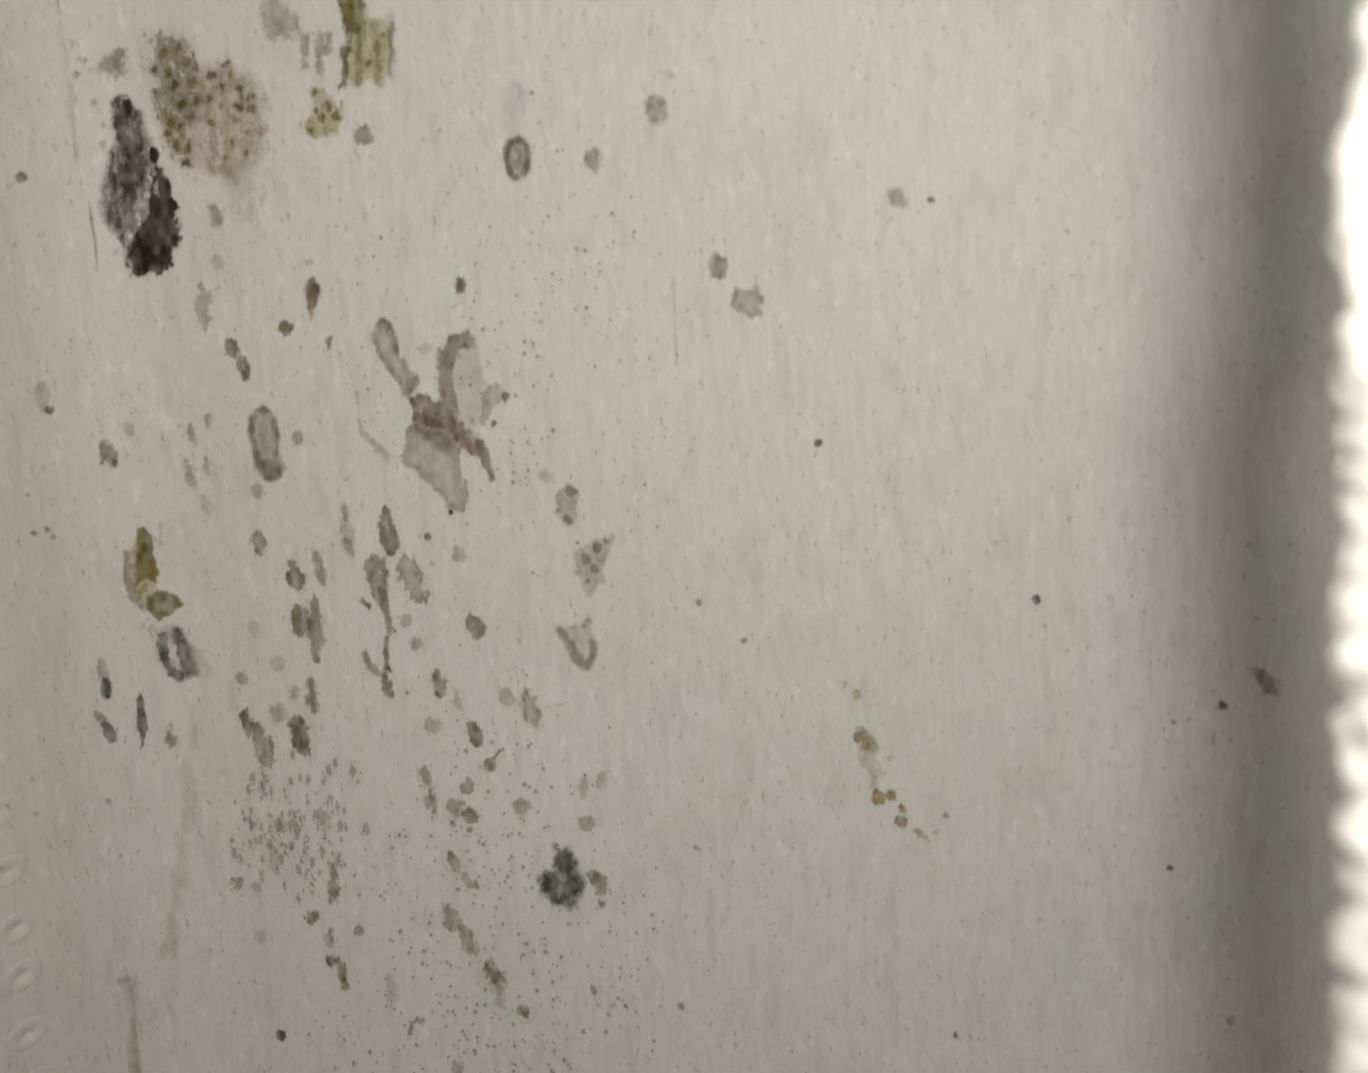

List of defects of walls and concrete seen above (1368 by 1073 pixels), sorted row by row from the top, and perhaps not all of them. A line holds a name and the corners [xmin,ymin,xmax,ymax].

leakage [61,0,399,386]
leakage [94,418,140,471]
leakage [244,401,307,503]
leakage [351,251,620,676]
leakage [119,498,665,1073]
leakage [112,969,152,1073]